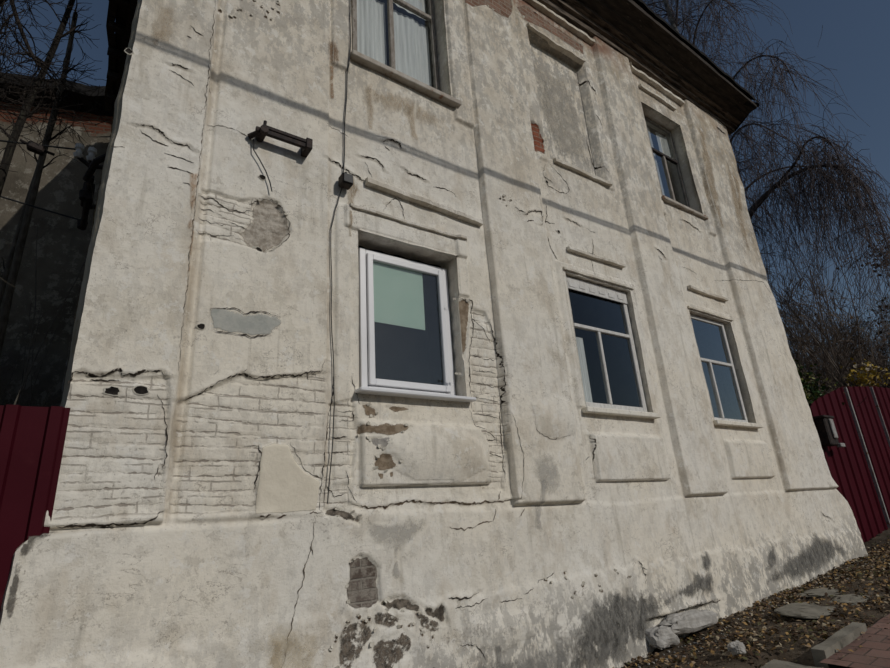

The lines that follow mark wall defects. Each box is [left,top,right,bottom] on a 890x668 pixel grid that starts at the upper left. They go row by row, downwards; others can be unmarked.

spalling [464,0,584,54]
crack [329,139,401,181]
spalling [530,121,545,154]
crack [68,4,290,478]
spalling [241,198,290,252]
spalling [453,298,470,352]
spalling [357,403,409,479]
crack [186,297,567,668]
crack [59,511,163,529]
damp [768,536,844,581]
spalling [329,557,445,668]
damp [495,553,713,668]